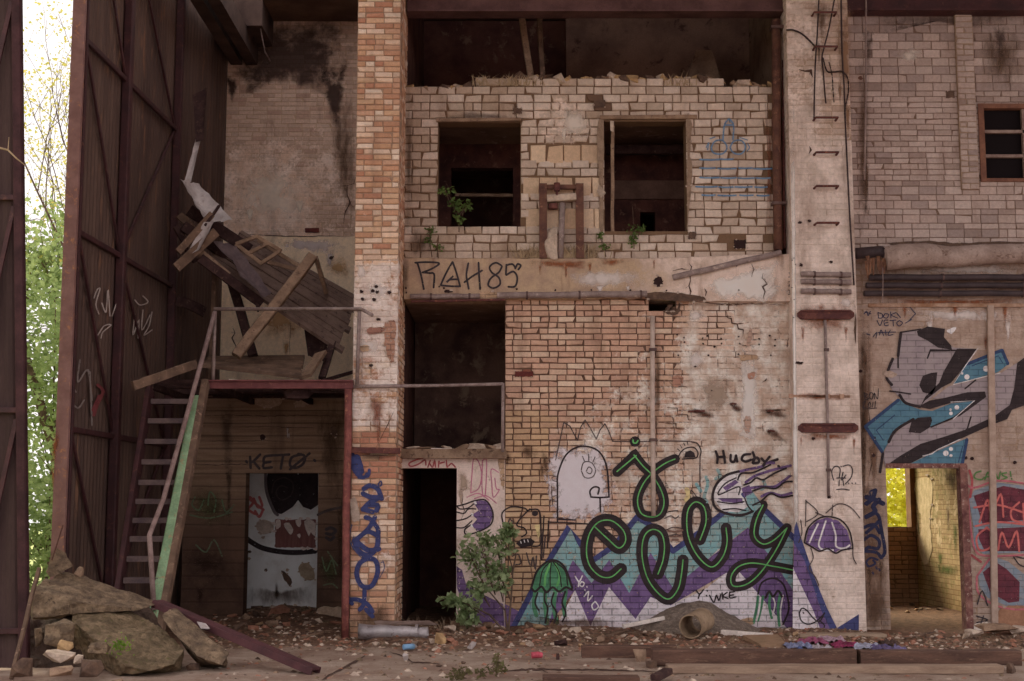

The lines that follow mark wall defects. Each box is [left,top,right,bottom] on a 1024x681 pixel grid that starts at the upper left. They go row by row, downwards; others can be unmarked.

damp [327,78,351,191]
peeling [360,317,396,363]
peeling [736,329,760,438]